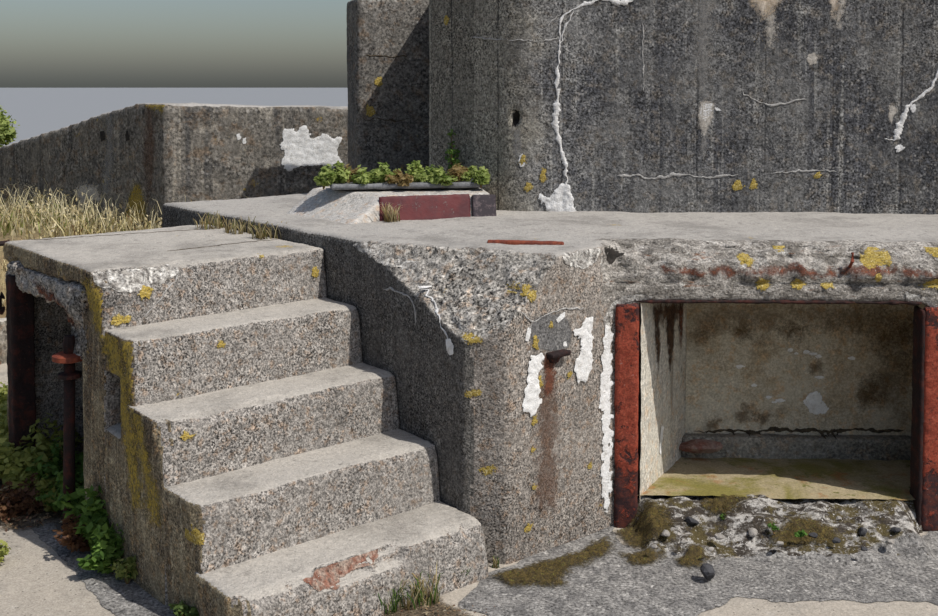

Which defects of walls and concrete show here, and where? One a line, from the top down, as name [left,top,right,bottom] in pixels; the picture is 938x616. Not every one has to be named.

crack [639,24,647,90]
crack [473,0,633,212]
crack [742,90,807,107]
crack [885,70,938,152]
peeling [280,125,342,171]
crack [617,171,738,179]
crack [761,168,836,176]
rust [662,262,938,279]
rust [650,303,683,371]
peeling [522,327,545,417]
rust [544,356,557,395]
peeling [573,294,653,513]